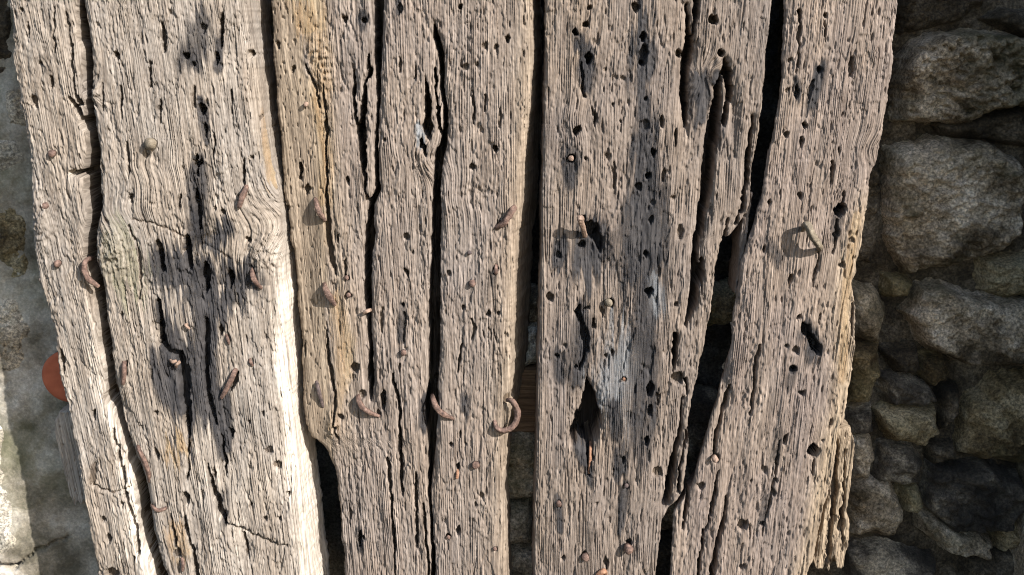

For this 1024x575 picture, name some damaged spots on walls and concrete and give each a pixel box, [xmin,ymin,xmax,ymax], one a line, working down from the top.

crack [81,7,94,66]
crack [671,0,729,364]
crack [77,99,200,575]
crack [128,218,228,299]
crack [355,0,477,575]
crack [713,344,761,451]
crack [765,459,777,515]